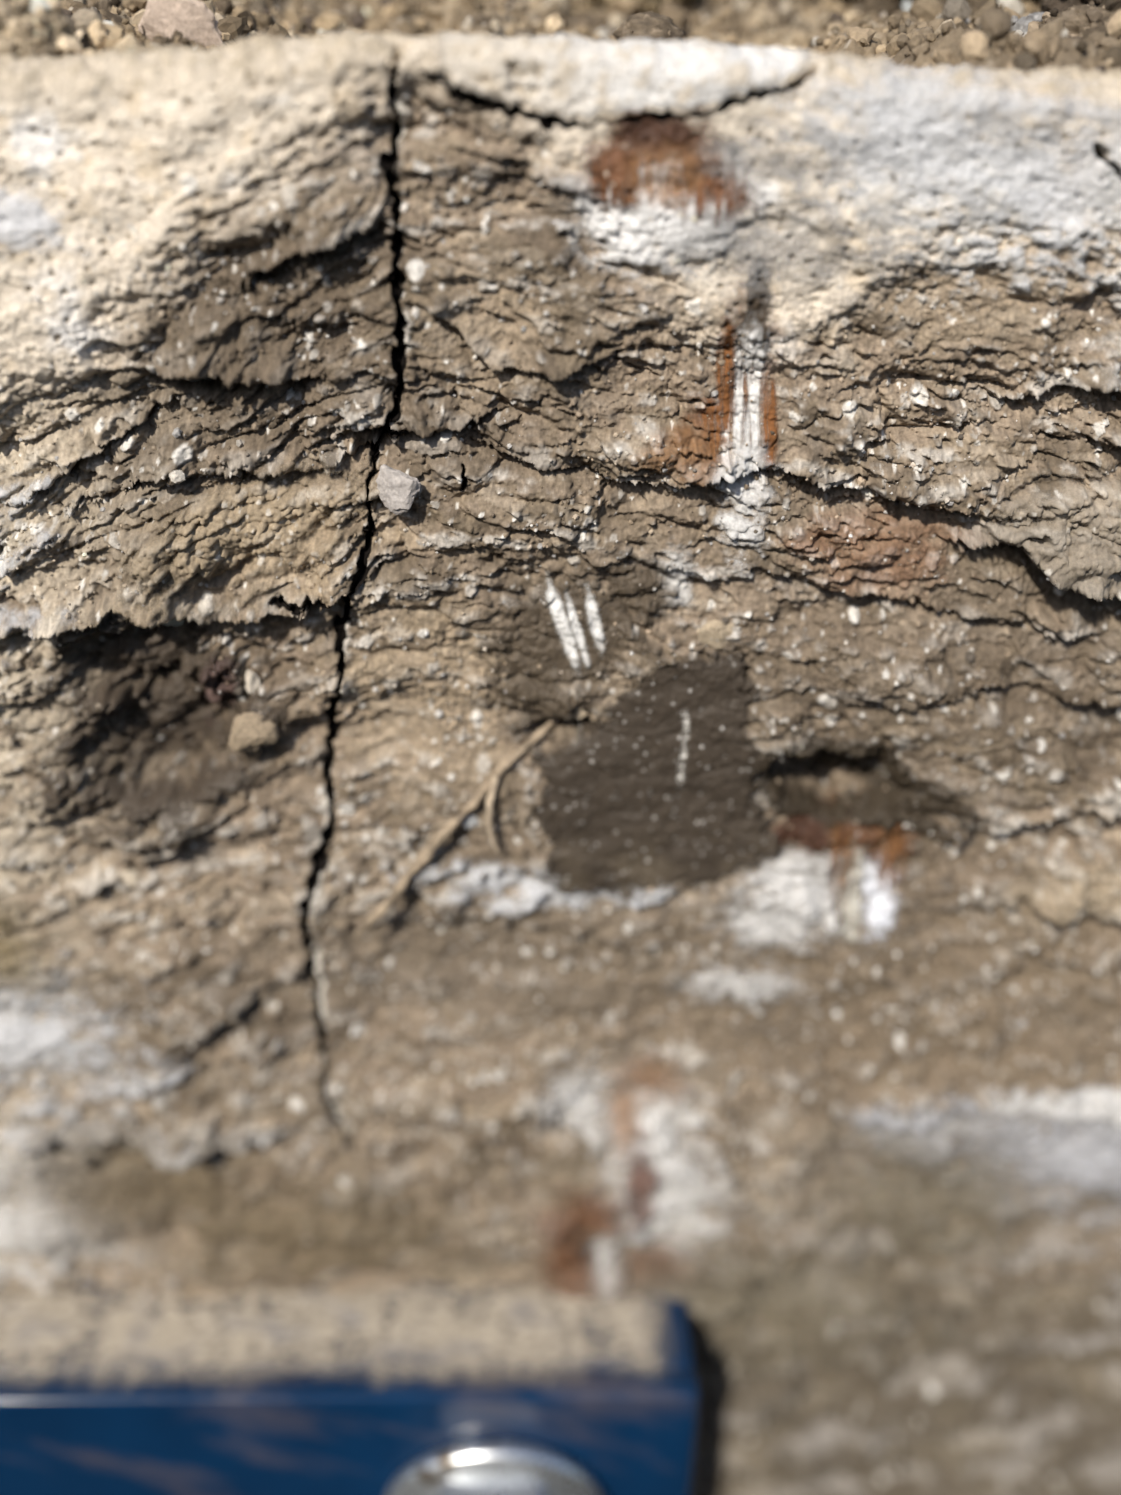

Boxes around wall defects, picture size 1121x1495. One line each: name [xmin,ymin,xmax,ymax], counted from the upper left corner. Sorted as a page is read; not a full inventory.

leakage [0,190,62,251]
rust [560,109,758,291]
leakage [711,230,827,278]
leakage [806,76,1121,292]
rust [685,266,777,475]
crack [270,72,797,1156]
leakage [416,553,979,914]
rust [775,806,914,892]